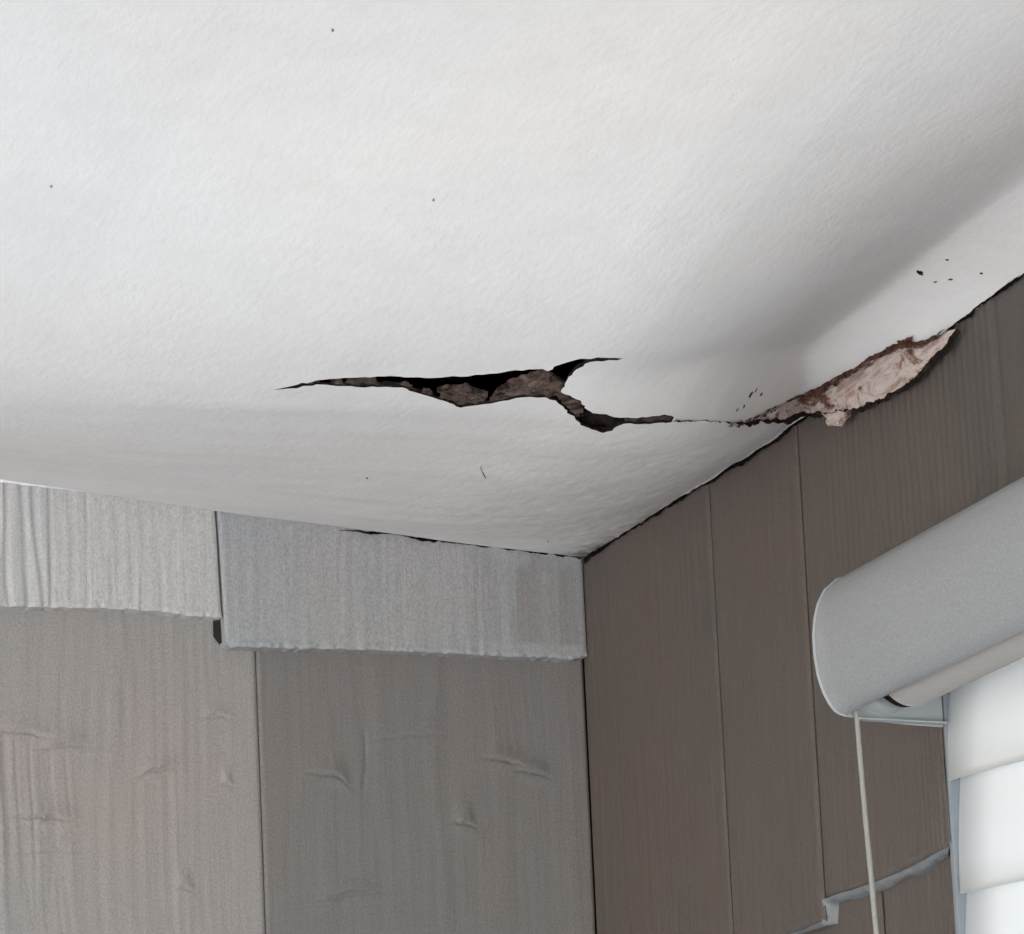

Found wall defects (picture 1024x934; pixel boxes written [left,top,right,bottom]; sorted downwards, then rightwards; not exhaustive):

crack [275,357,742,433]
peeling [728,329,960,428]